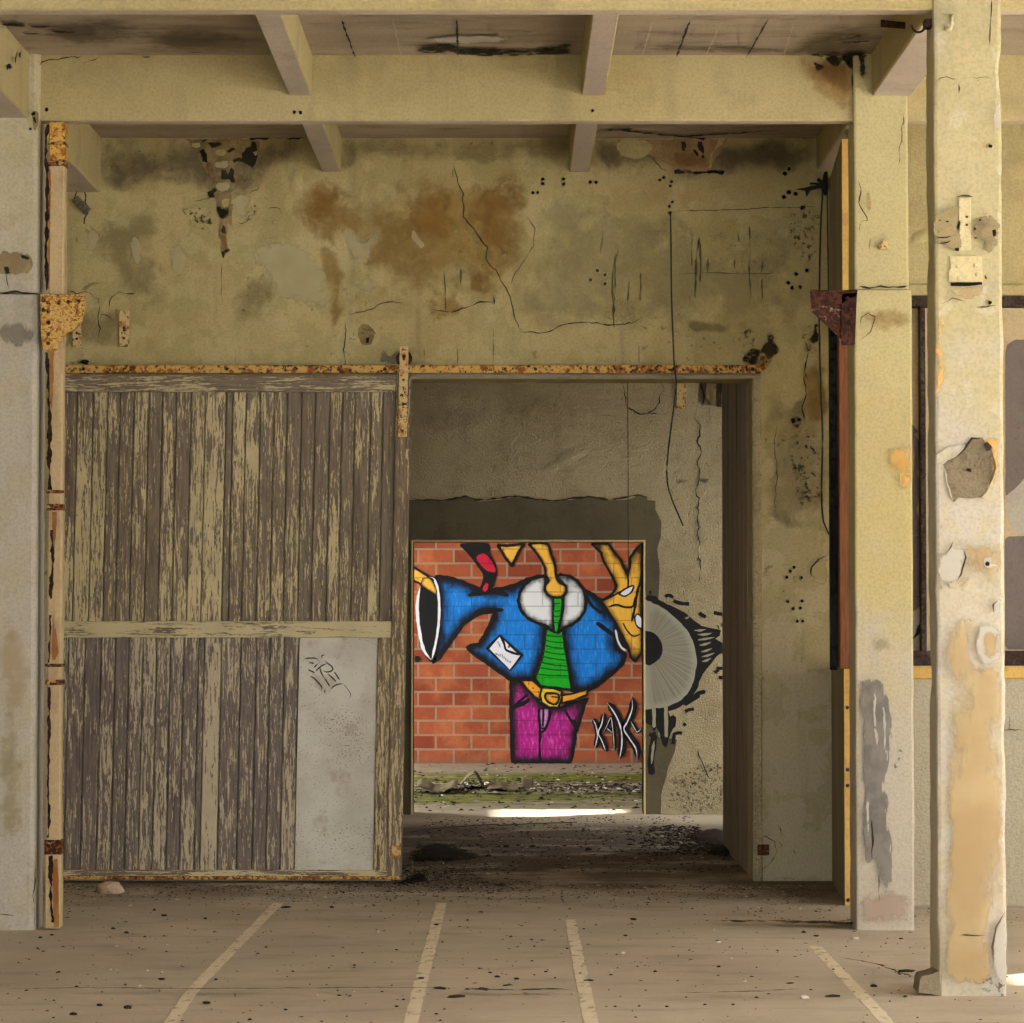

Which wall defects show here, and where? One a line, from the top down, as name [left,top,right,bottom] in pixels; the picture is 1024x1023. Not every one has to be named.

flaking render [186,138,260,258]
crack [436,159,639,334]
flaking render [618,138,728,171]
flaking render [933,195,973,251]
flaking render [974,213,1000,252]
crack [695,410,707,586]
flaking render [936,437,996,502]
peeling [403,495,662,814]
peeling [645,723,677,814]
peeling [991,911,1007,986]